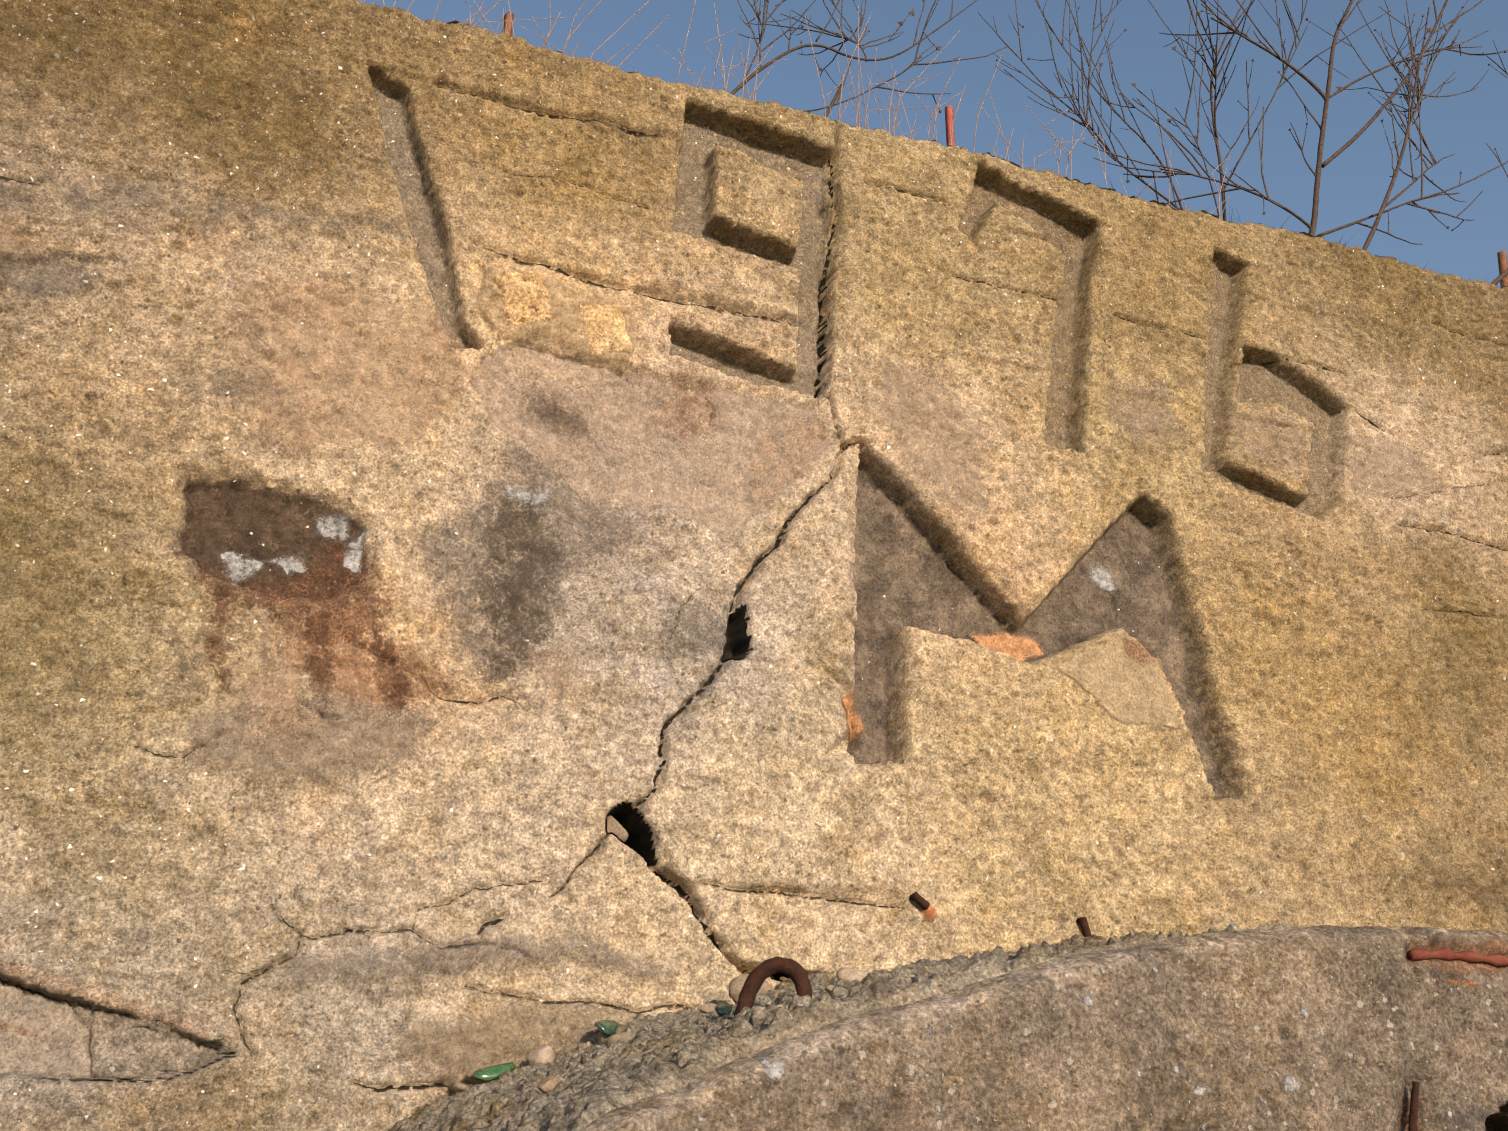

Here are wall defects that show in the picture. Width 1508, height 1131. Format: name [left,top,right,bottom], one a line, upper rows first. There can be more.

crack [0,176,37,185]
crack [814,156,835,398]
rust [172,538,444,715]
crack [134,740,215,759]
crack [225,444,861,1053]
rust [919,906,936,920]
crack [39,1075,165,1083]
crack [354,1082,449,1092]
rust [1398,1098,1422,1131]